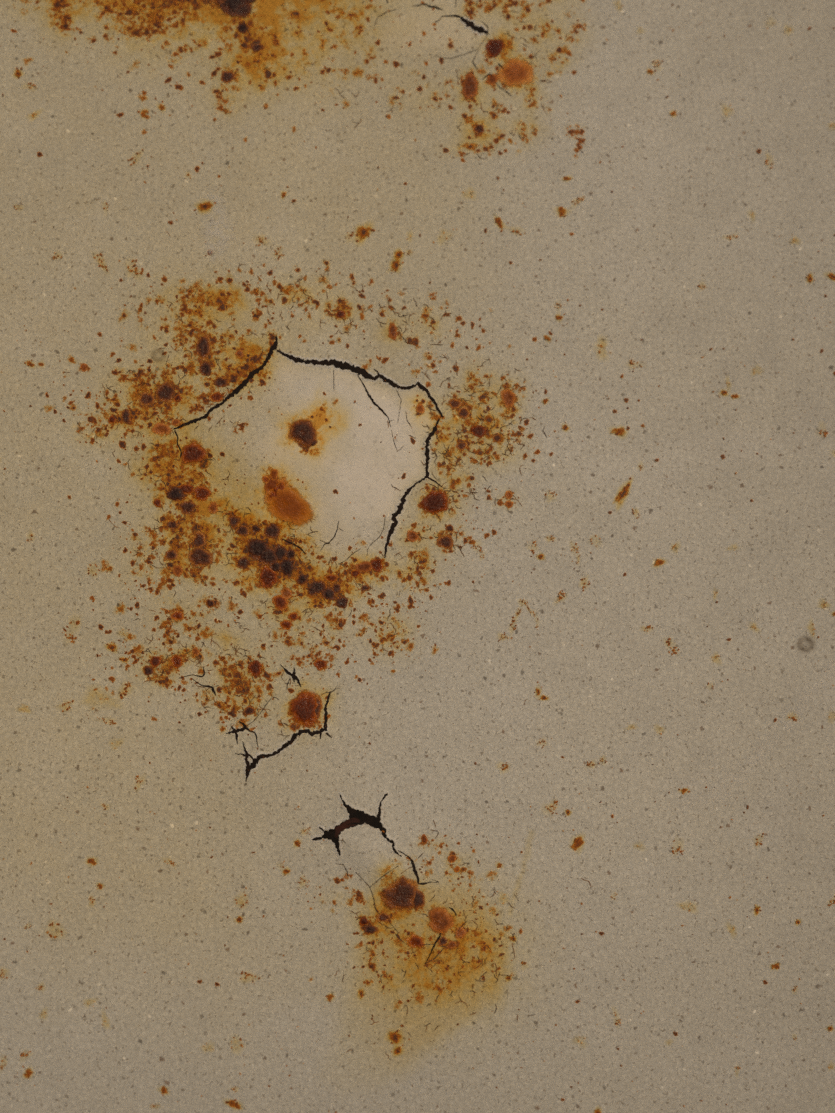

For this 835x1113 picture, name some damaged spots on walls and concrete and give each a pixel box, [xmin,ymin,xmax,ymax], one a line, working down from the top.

rust [14,0,586,162]
crack [374,0,511,96]
rust [3,236,581,757]
crack [173,336,443,564]
crack [226,664,337,781]
crack [309,791,467,964]
rust [263,820,527,1059]